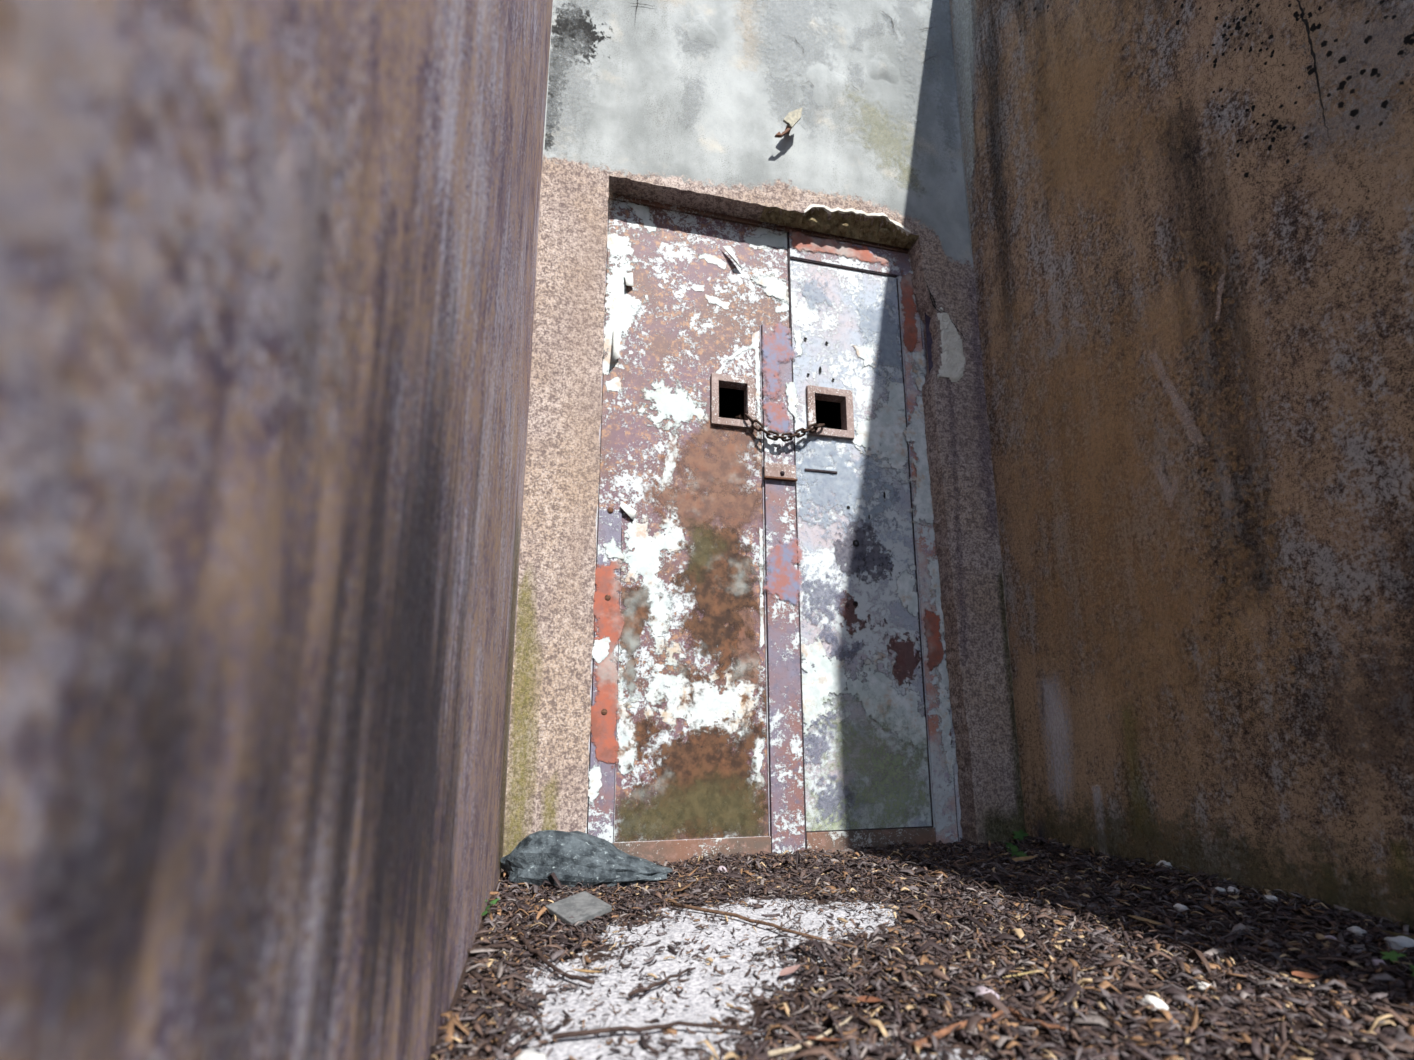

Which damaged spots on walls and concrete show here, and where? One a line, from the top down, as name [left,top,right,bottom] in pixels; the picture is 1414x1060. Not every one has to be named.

damp [545,0,612,152]
peeling [603,231,649,393]
peeling [627,202,662,235]
peeling [692,204,966,540]
corrosion [616,413,768,842]
peeling [588,378,957,826]